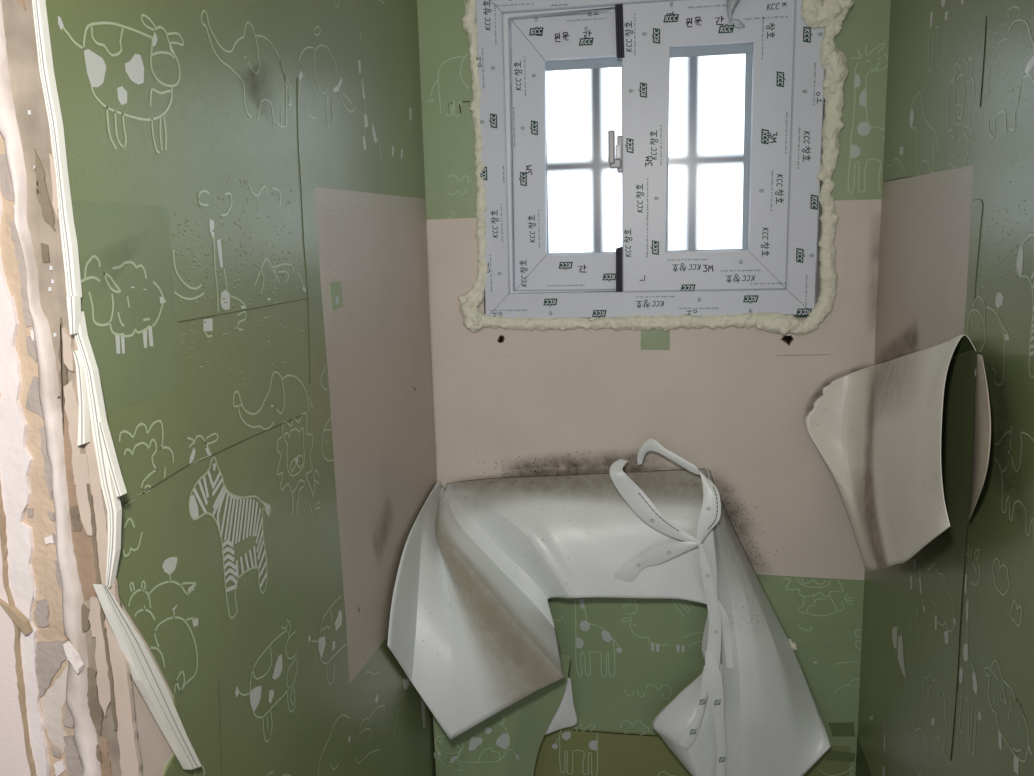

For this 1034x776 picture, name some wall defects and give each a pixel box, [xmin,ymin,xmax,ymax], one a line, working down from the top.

spalling [0,0,201,776]
leakage [465,451,617,497]
leakage [623,470,781,577]